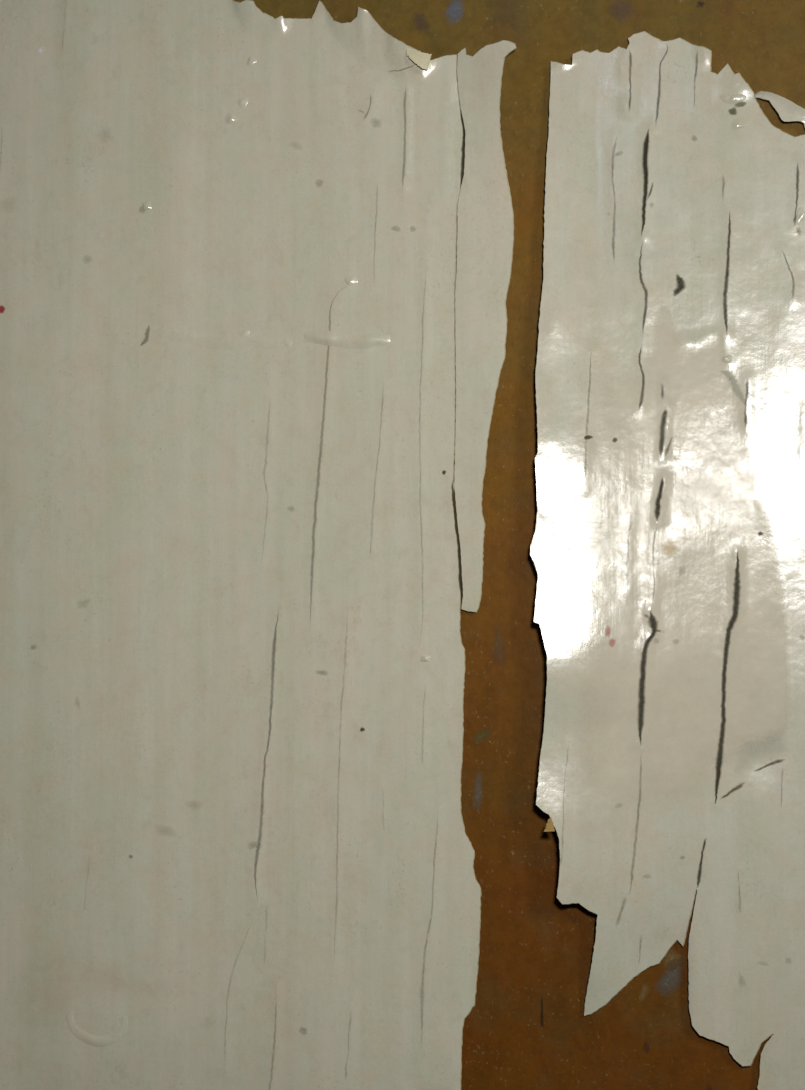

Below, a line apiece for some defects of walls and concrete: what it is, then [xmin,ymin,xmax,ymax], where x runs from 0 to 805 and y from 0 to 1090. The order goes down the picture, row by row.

crack [639,52,667,453]
peeling [234,0,805,1090]
crack [655,480,663,518]
crack [639,614,659,742]
crack [715,554,781,800]